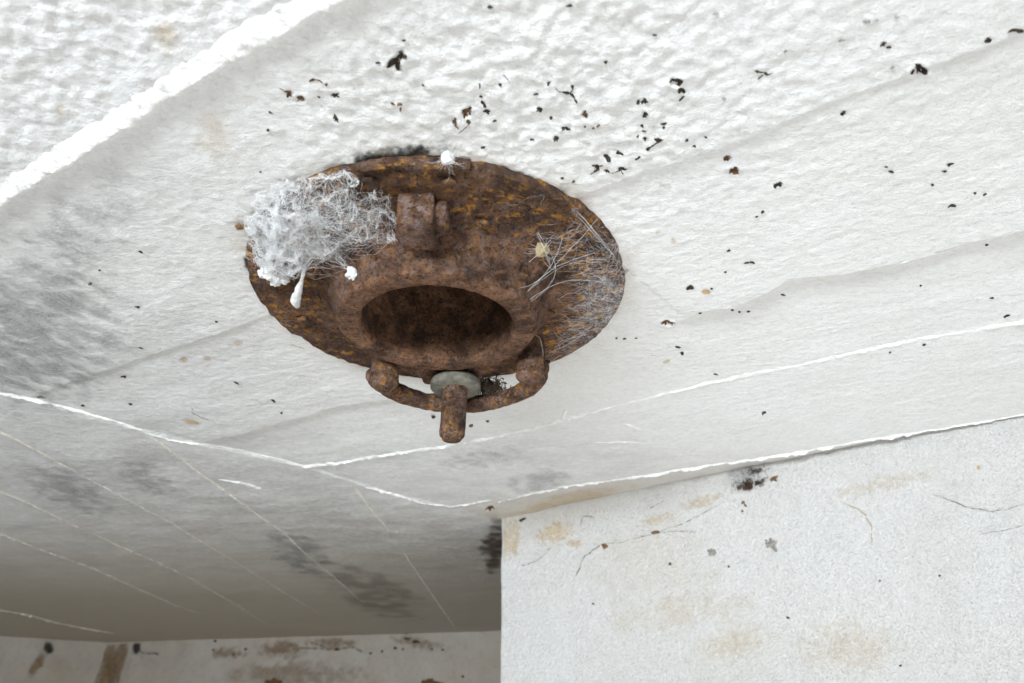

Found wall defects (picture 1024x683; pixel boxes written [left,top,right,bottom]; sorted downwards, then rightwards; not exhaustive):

rust [356,176,380,192]
crack [935,495,1021,534]
crack [575,501,712,577]